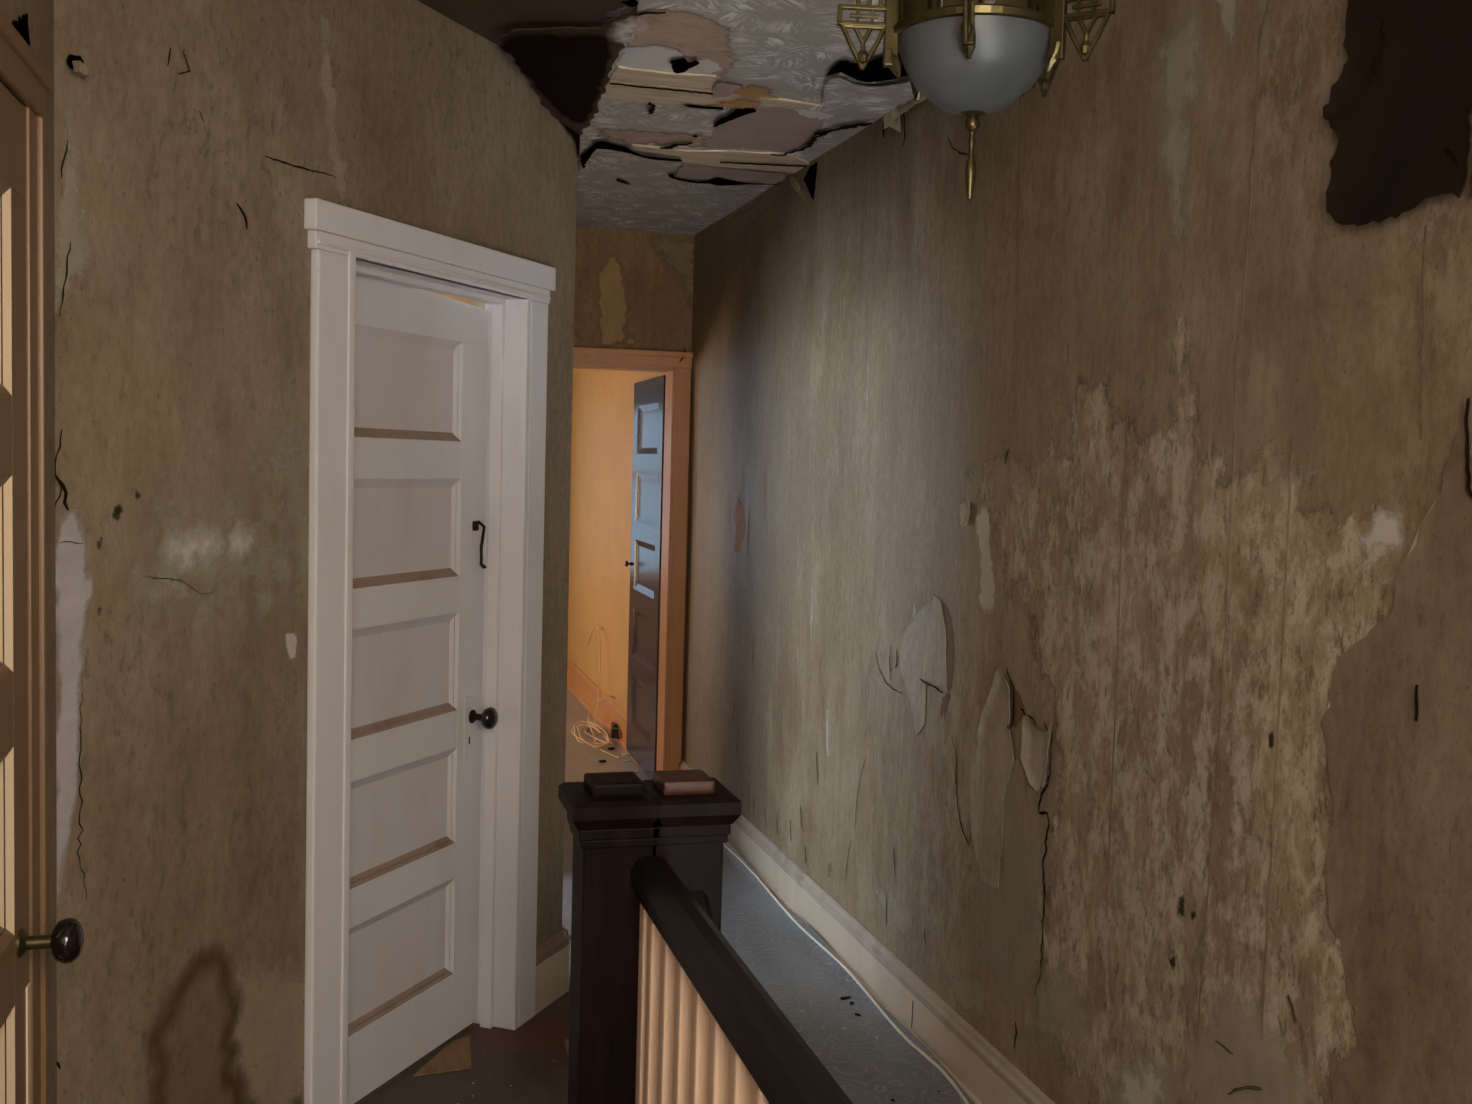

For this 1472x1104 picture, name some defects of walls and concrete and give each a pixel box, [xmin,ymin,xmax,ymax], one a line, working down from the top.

crack [265,156,337,177]
peeling [707,108,835,152]
crack [55,429,69,511]
peeling [976,507,995,611]
peeling [1360,510,1403,554]
flaking render [56,511,93,904]
leakage [1178,897,1196,919]
leakage [153,954,246,1104]